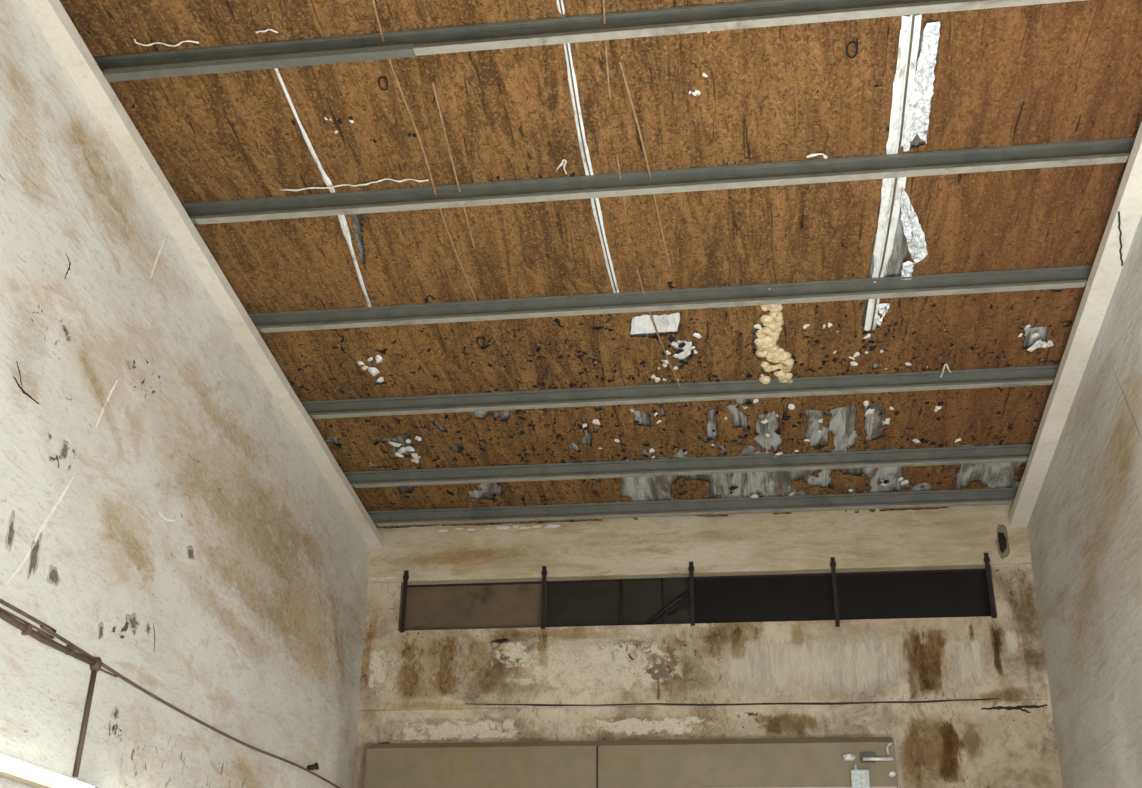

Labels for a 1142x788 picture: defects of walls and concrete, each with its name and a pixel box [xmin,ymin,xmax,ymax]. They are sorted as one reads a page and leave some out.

peeling [632,333,702,384]
peeling [698,399,830,455]
peeling [863,400,899,453]
peeling [912,429,963,450]
peeling [877,477,925,491]
damp [368,648,389,692]
damp [492,641,683,694]
damp [727,635,896,693]
damp [955,636,984,686]
damp [1005,629,1021,655]
damp [386,718,530,742]
damp [581,716,724,736]